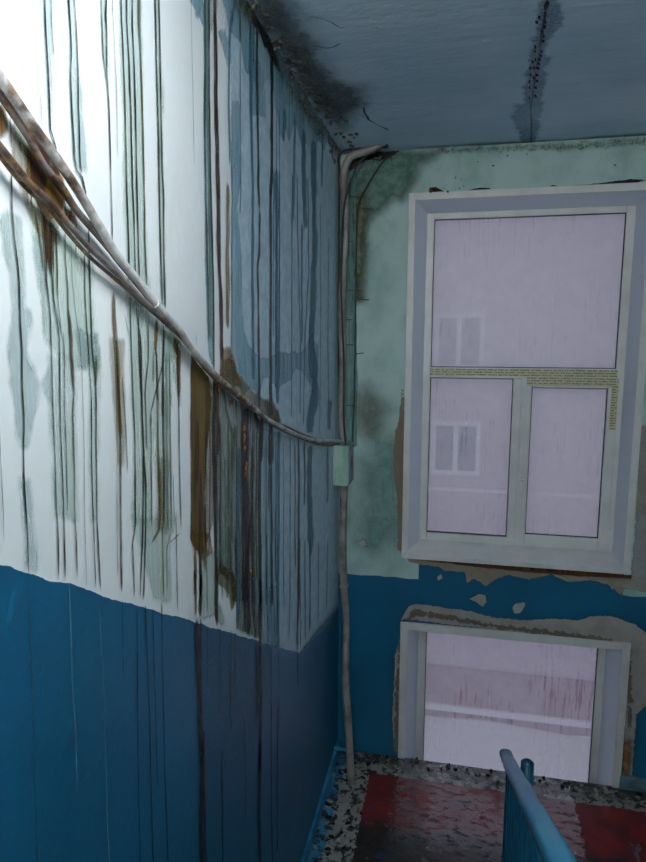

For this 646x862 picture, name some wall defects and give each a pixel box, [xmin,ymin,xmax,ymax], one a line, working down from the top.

damp [44,0,57,150]
damp [68,0,86,194]
damp [101,0,147,284]
damp [154,0,166,308]
damp [191,0,333,432]
crack [512,0,562,143]
damp [4,175,35,571]
damp [33,198,101,587]
rust [190,348,312,649]
flaking render [392,389,646,776]
damp [195,619,207,862]
damp [257,644,278,862]